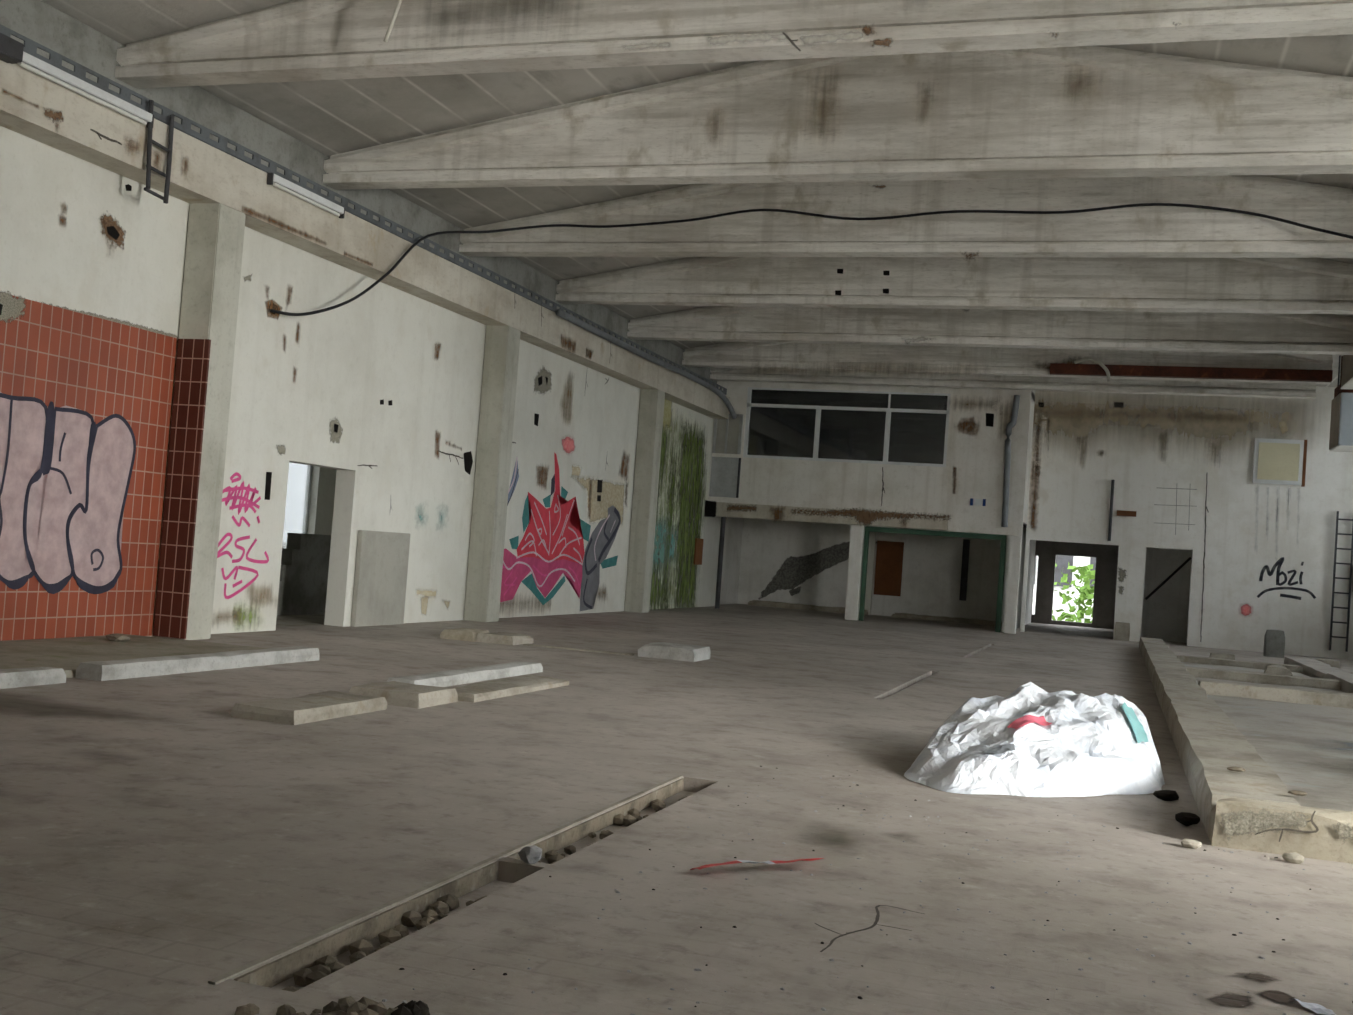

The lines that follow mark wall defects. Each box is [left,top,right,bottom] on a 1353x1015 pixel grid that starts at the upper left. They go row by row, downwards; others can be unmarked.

flaking render [100,214,126,249]
water stain [650,399,705,610]
water stain [1209,973,1295,1007]